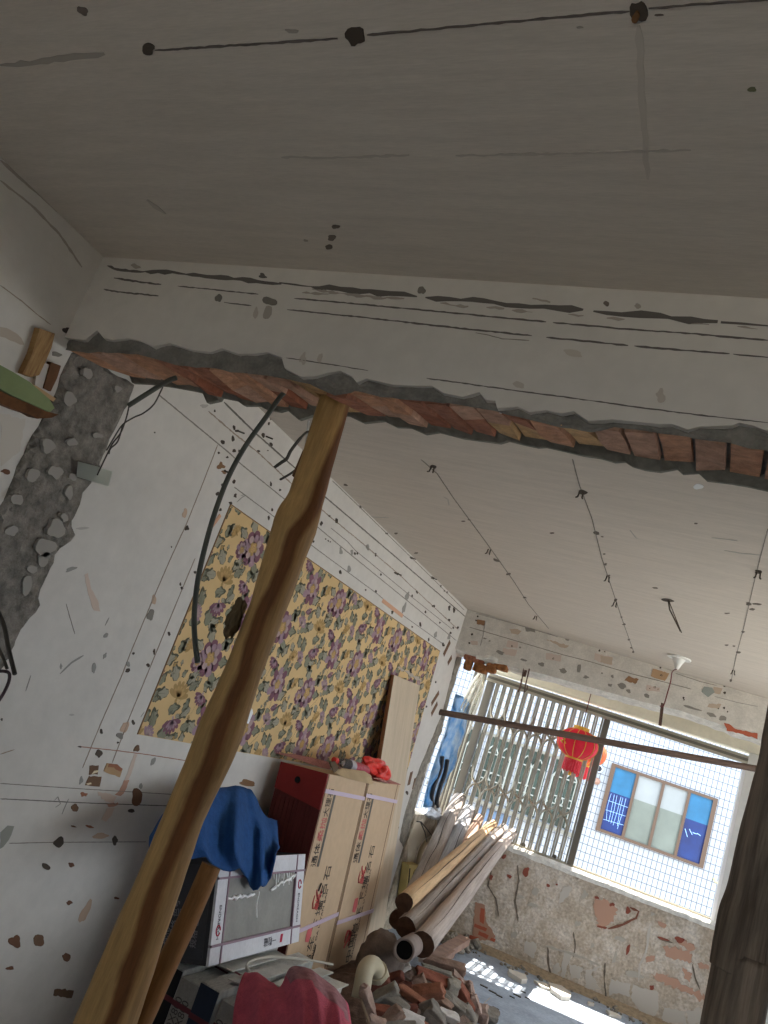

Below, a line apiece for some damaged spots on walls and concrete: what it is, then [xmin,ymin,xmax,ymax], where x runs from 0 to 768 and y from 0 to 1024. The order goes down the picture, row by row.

crack [155,38,338,51]
crack [367,0,768,36]
crack [104,265,768,358]
spalling [0,327,768,670]
crack [311,459,768,707]
flaking render [469,902,496,942]
flaking render [593,896,631,929]
peeling [553,936,709,1024]